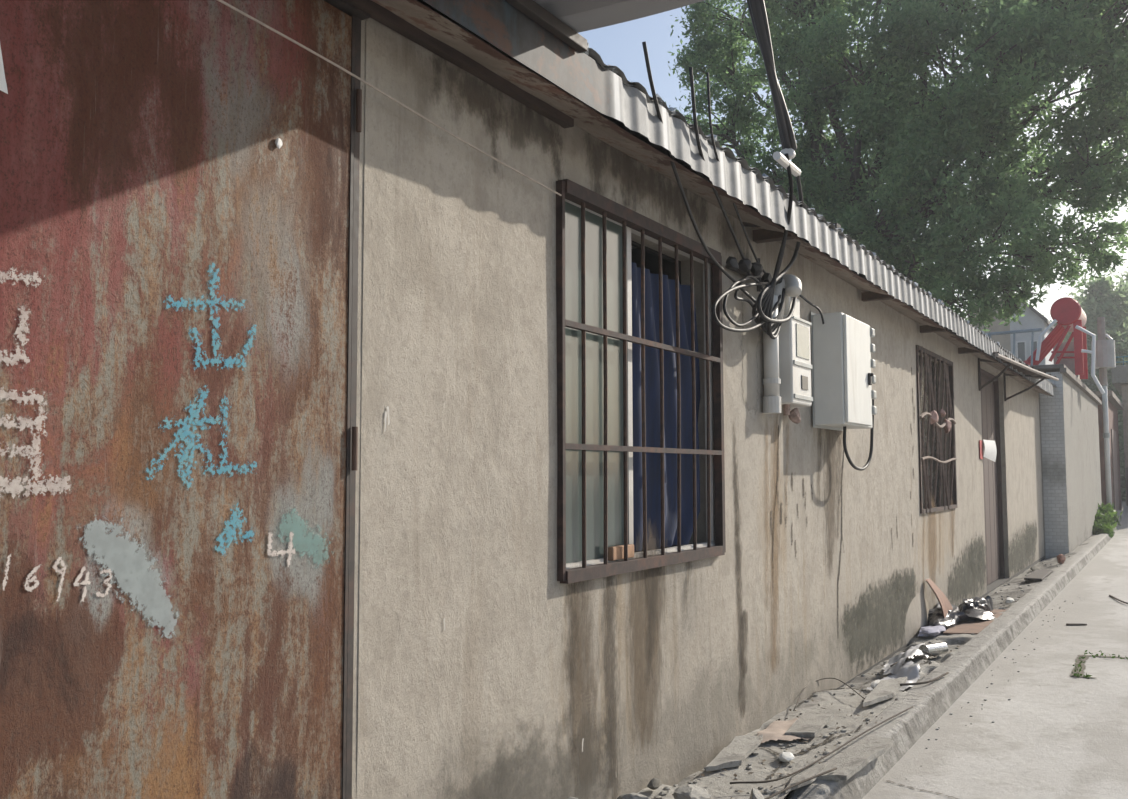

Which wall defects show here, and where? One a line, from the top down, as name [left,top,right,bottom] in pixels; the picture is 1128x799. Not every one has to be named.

water stain [630,535,665,741]
water stain [843,569,916,666]
water stain [948,537,986,606]
water stain [1008,522,1037,585]
water stain [459,576,618,799]